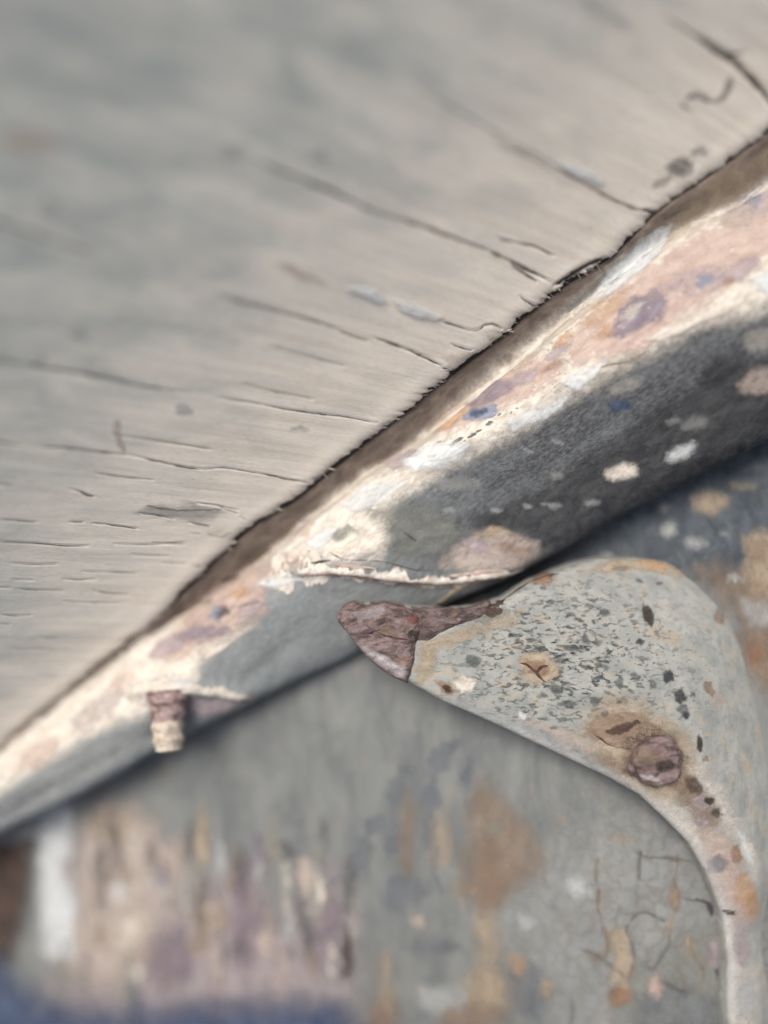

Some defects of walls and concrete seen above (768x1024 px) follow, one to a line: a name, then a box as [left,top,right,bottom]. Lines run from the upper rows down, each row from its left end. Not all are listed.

crack [667,17,768,101]
crack [261,163,603,306]
crack [221,296,499,369]
peeling [268,182,768,571]
crack [0,436,308,497]
rust [355,607,384,618]
rust [410,526,559,688]
peeling [642,606,654,626]
peeling [651,670,695,719]
peeling [0,619,249,958]
rust [586,701,757,920]
rust [609,929,633,1005]